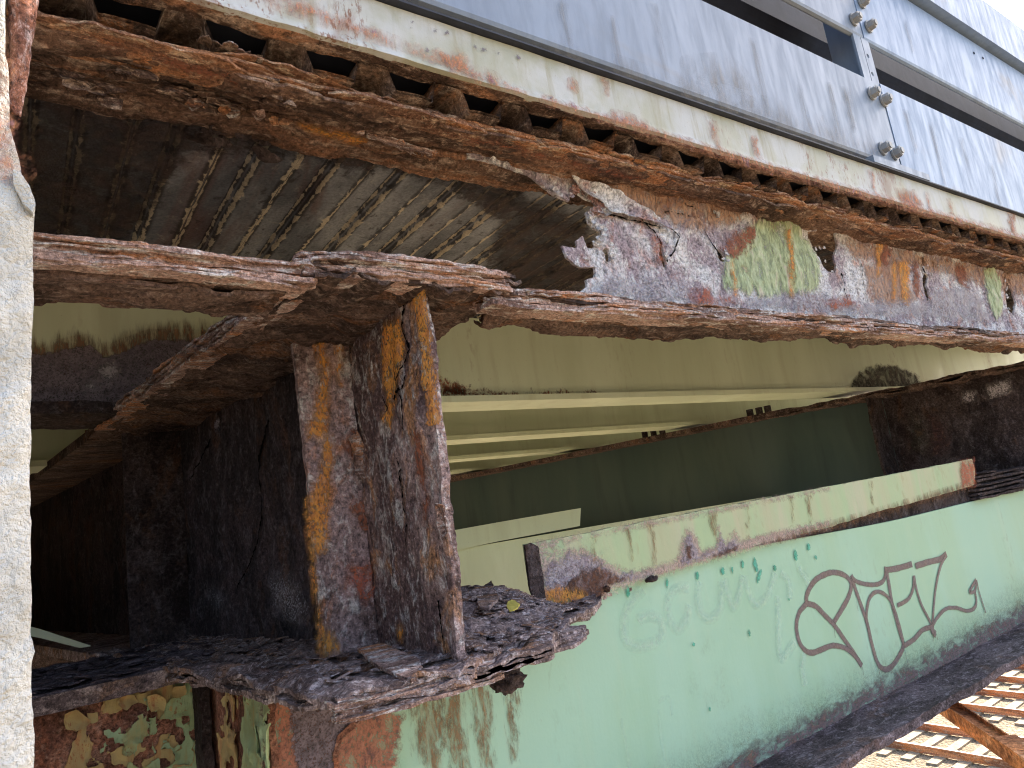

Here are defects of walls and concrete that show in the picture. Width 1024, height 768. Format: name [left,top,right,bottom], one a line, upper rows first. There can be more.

rust [0,10,1024,537]
crack [610,203,721,262]
peeling [722,218,838,298]
peeling [984,267,1009,319]
crack [382,305,410,430]
rust [305,343,366,593]
rust [524,487,855,604]
rust [554,625,589,654]
peeling [64,683,197,768]
peeling [216,693,271,768]
rust [260,655,505,768]